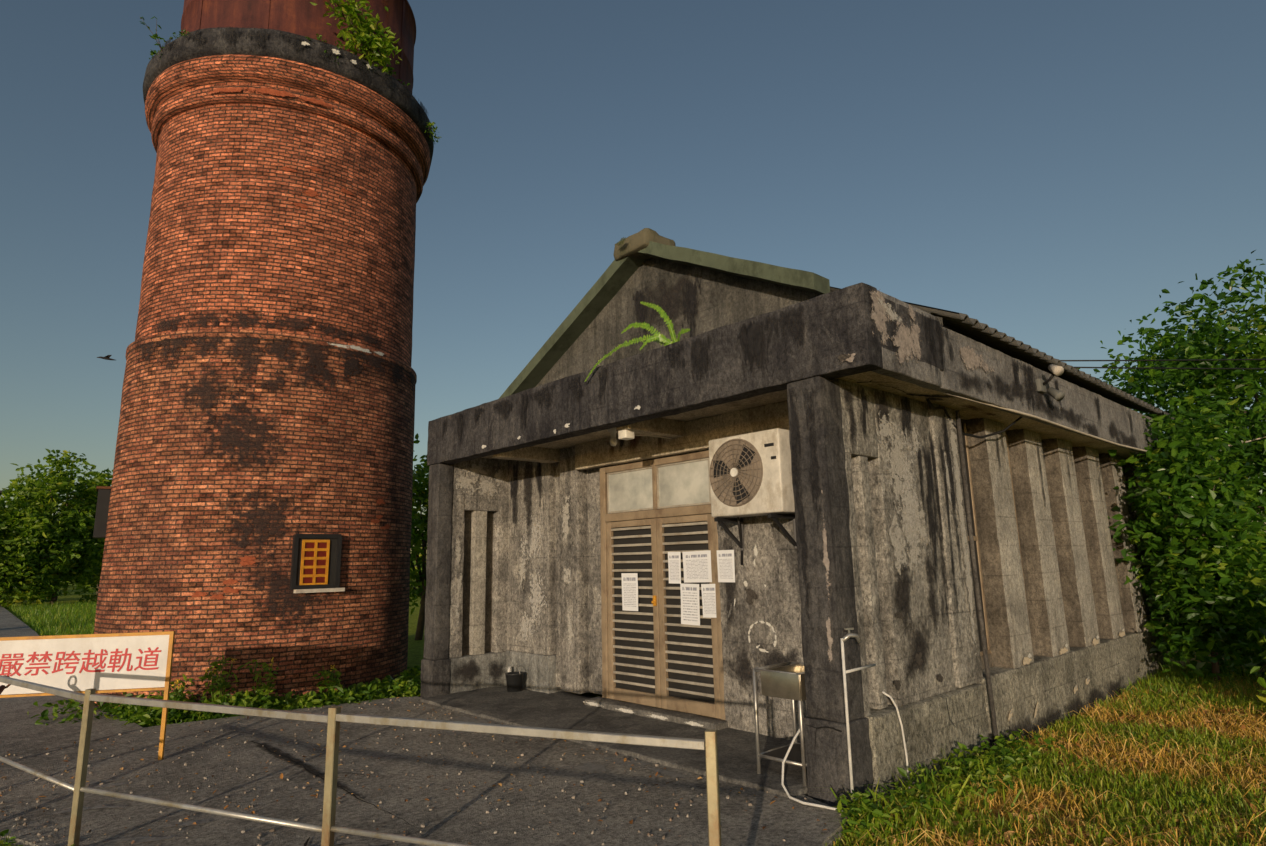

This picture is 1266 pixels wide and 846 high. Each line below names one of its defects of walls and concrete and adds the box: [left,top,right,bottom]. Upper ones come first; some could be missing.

water stain [442,377,582,442]
water stain [633,275,711,380]
water stain [737,307,804,377]
water stain [922,312,1137,451]
water stain [136,308,415,633]
water stain [510,462,542,546]
water stain [845,387,949,673]
water stain [454,661,503,683]
crack [251,741,417,828]